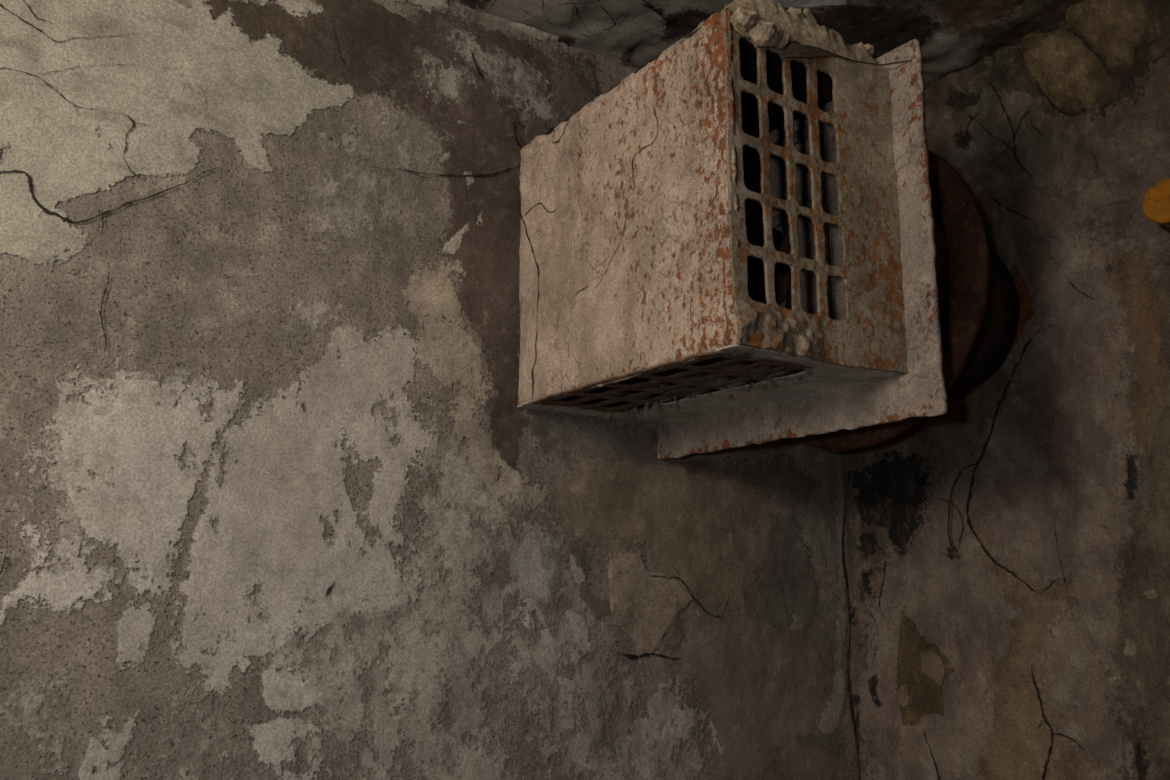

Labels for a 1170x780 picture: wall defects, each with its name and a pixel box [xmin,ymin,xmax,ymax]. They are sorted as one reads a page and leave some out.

crack [0,0,231,354]
crack [486,0,674,67]
water stain [382,0,881,780]
crack [799,509,886,780]
water stain [844,450,934,627]
crack [935,327,1076,626]